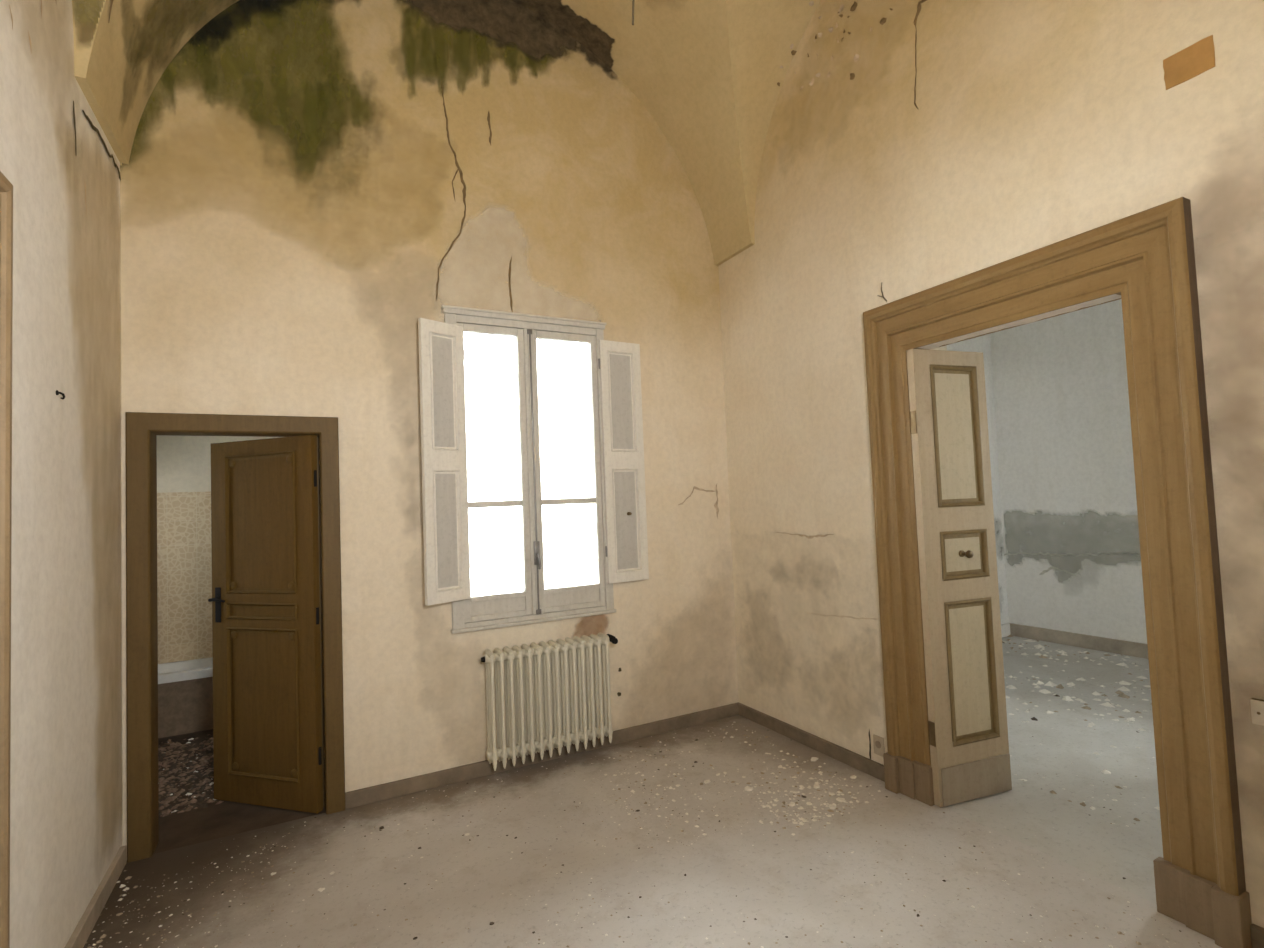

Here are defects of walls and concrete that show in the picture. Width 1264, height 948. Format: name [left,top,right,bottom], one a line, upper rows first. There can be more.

water stain [121,0,371,170]
flaking render [403,0,615,78]
crack [913,0,927,109]
crack [73,101,121,181]
crack [436,85,466,300]